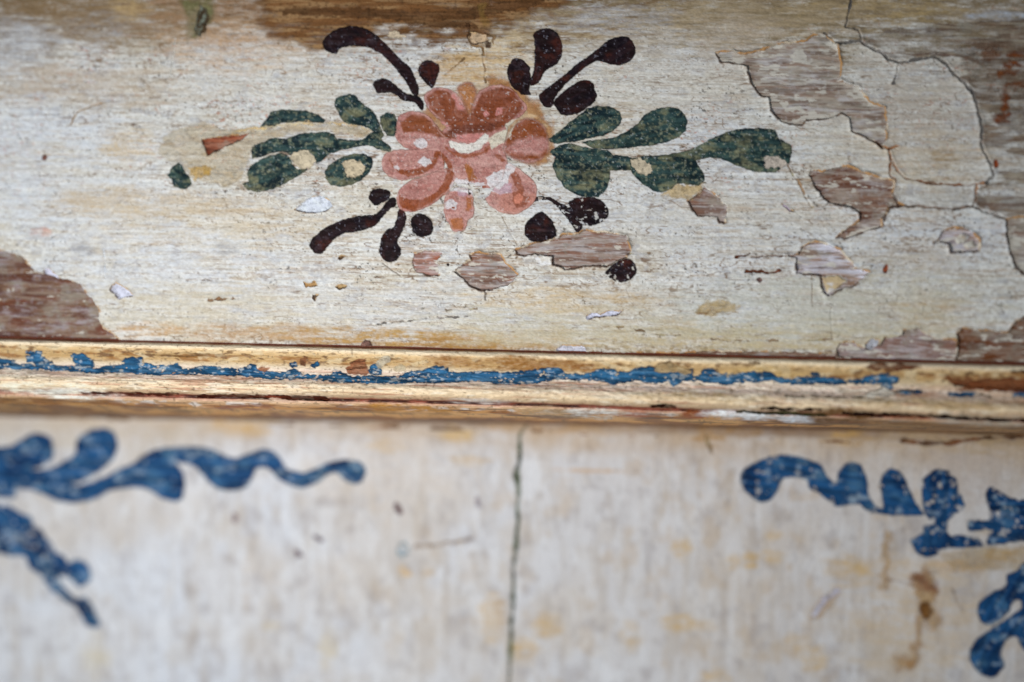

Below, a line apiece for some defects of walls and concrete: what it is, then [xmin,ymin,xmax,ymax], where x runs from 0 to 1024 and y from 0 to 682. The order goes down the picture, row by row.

peeling [715,34,888,149]
crack [824,0,1024,275]
peeling [0,250,120,340]
peeling [412,251,442,277]
peeling [455,229,631,292]
peeling [687,187,727,224]
crack [735,254,783,274]
crack [787,165,813,208]
peeling [789,165,905,296]
peeling [933,226,981,254]
peeling [654,316,1024,375]
crack [508,434,522,681]